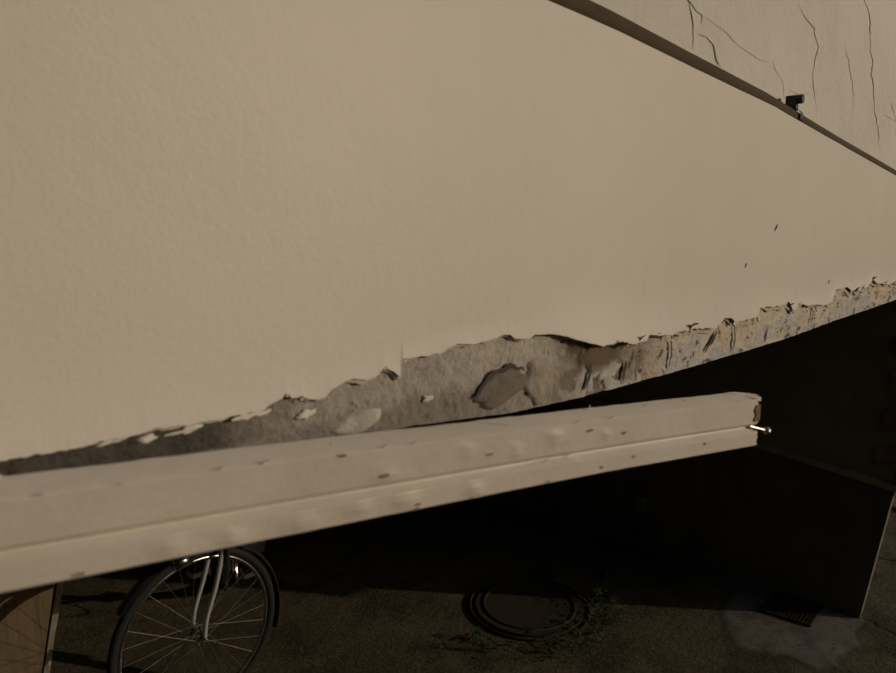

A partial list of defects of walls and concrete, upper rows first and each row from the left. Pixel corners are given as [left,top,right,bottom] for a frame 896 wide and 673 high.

crack [687,0,786,99]
crack [798,2,820,112]
crack [845,0,896,151]
peeling [0,277,896,476]